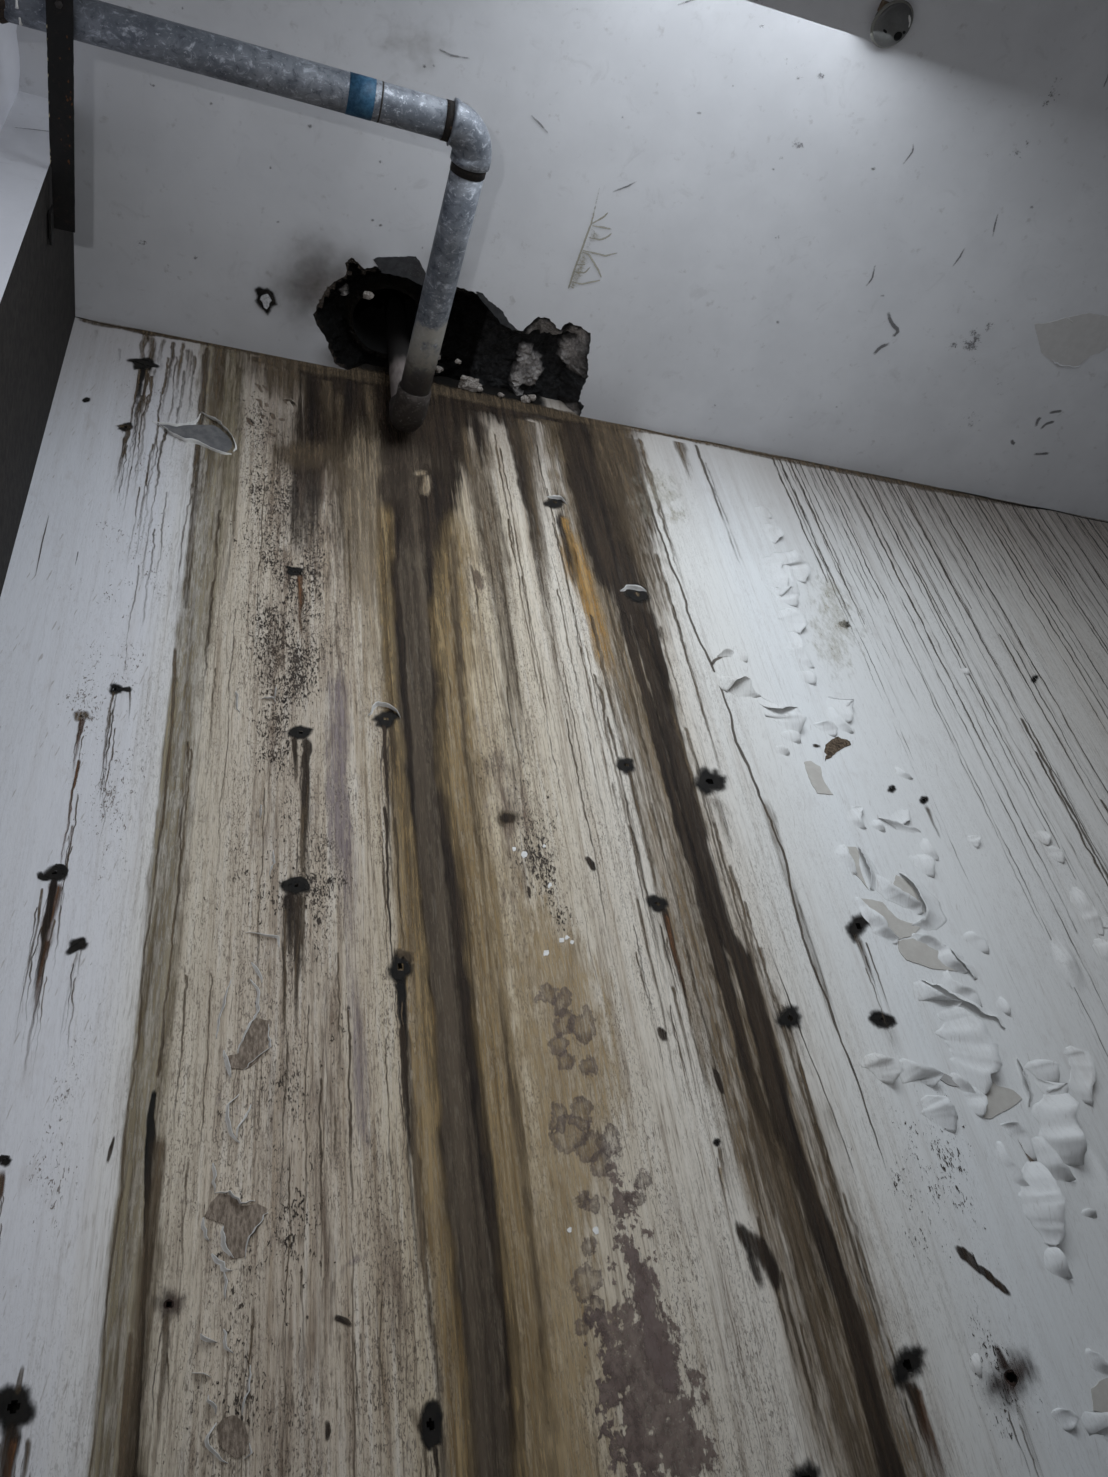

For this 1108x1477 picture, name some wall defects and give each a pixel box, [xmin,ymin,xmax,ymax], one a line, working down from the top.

rust [557,515,578,578]
peeling [709,506,854,795]
damp [773,459,1108,903]
rust [26,879,62,1005]
damp [29,1038,88,1242]
peeling [201,1163,267,1299]
peeling [216,962,271,1078]
rust [283,738,312,1002]
damp [58,320,986,1477]
peeling [834,806,1097,1280]
rust [0,1423,31,1477]
damp [968,1299,1048,1439]